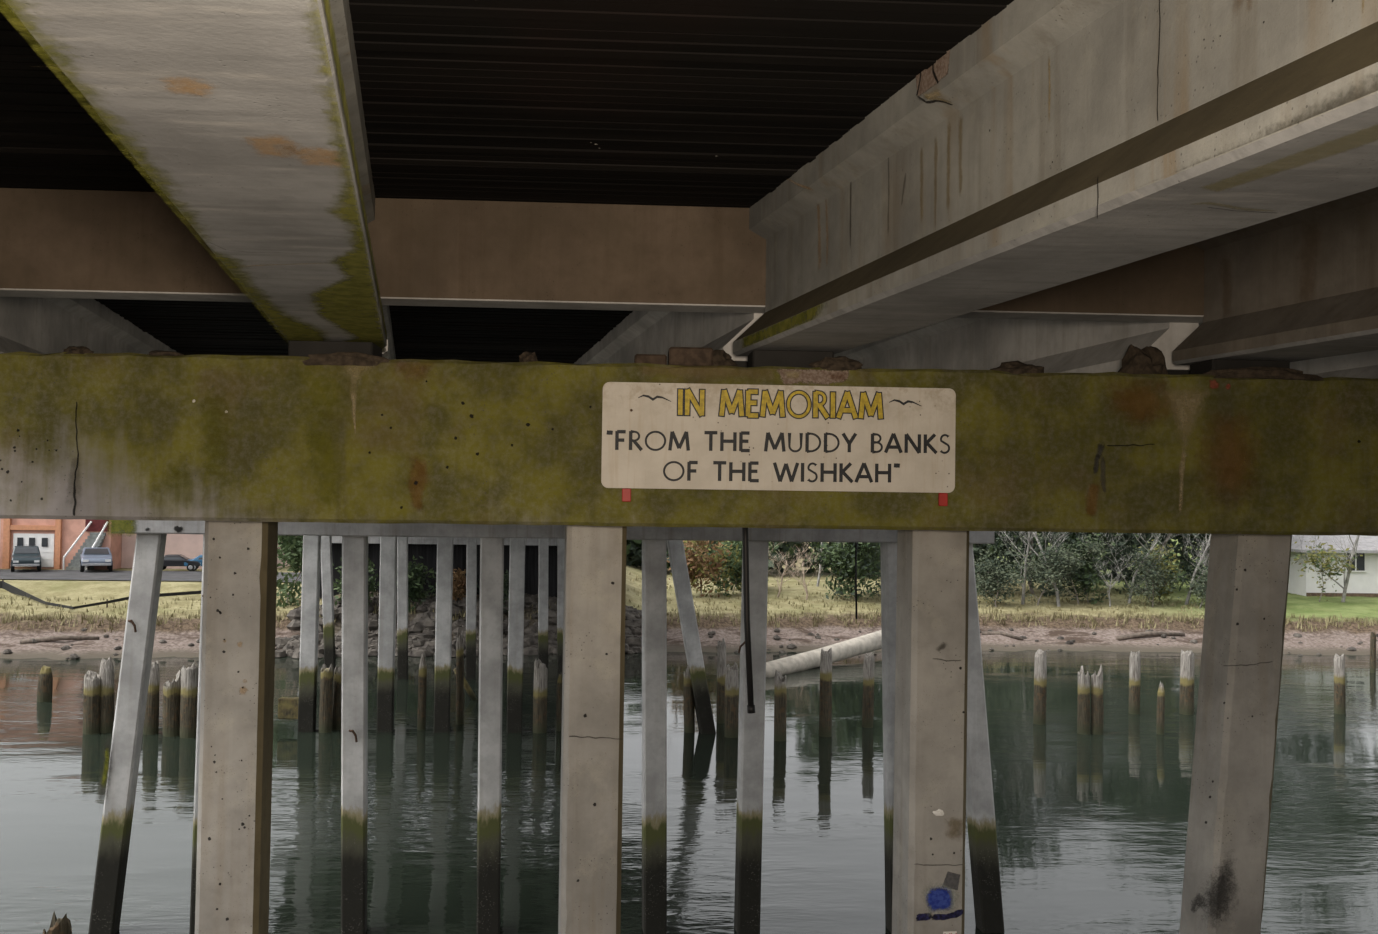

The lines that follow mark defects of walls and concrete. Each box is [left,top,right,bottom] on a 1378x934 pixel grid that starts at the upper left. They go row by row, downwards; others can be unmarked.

spalling [916,50,952,105]
crack [72,402,80,516]
water stain [1191,864,1235,919]